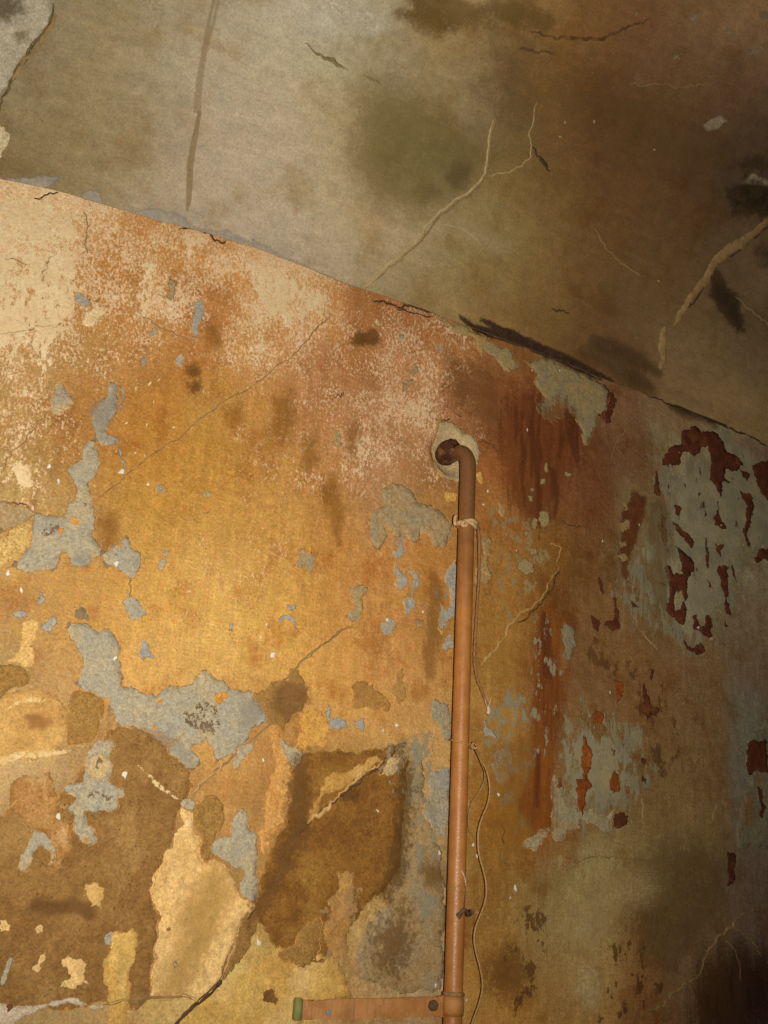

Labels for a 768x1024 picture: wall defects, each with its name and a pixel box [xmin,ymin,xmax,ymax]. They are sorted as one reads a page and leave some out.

crack [357,97,551,318]
peeling [0,381,142,579]
peeling [435,315,617,446]
rust [499,394,579,533]
peeling [590,426,768,659]
flaking render [0,483,457,1012]
rust [519,608,563,829]
peeling [482,669,660,852]
crack [0,908,260,1024]
water stain [553,852,663,1023]
water stain [690,939,768,1024]